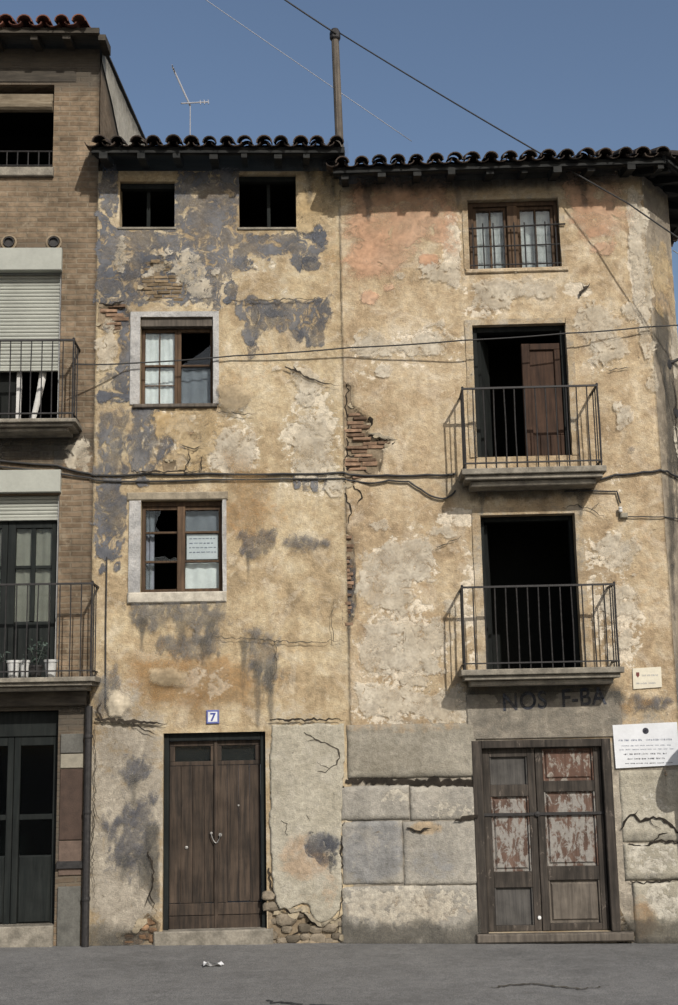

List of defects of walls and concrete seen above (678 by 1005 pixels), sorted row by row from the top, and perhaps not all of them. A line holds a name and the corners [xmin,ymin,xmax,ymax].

flaking render [472,272,557,318]
peeling [65,163,461,574]
crack [285,366,397,525]
water stain [247,629,279,689]
crack [95,701,165,734]
water stain [121,754,151,785]
crack [270,717,473,788]
water stain [103,794,160,899]
water stain [304,833,339,865]
crack [621,811,678,846]
flaking render [122,913,160,945]
flaking render [261,890,344,943]